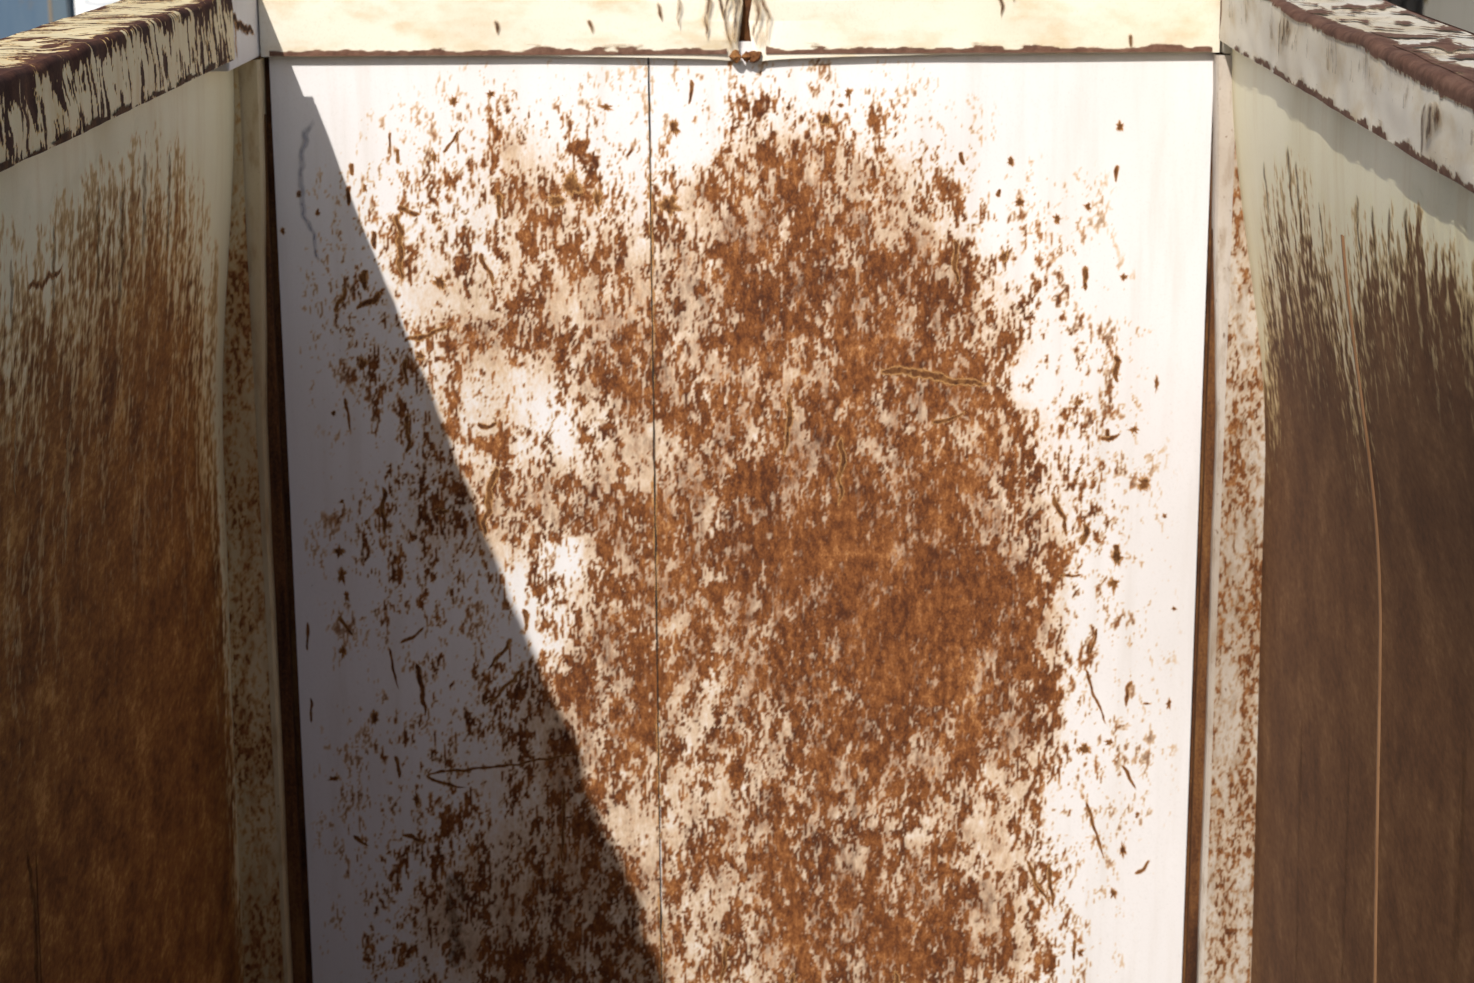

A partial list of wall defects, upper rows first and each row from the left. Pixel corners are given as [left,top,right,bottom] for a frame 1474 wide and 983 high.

rust [0,55,284,983]
rust [269,20,1212,983]
rust [1204,141,1474,983]